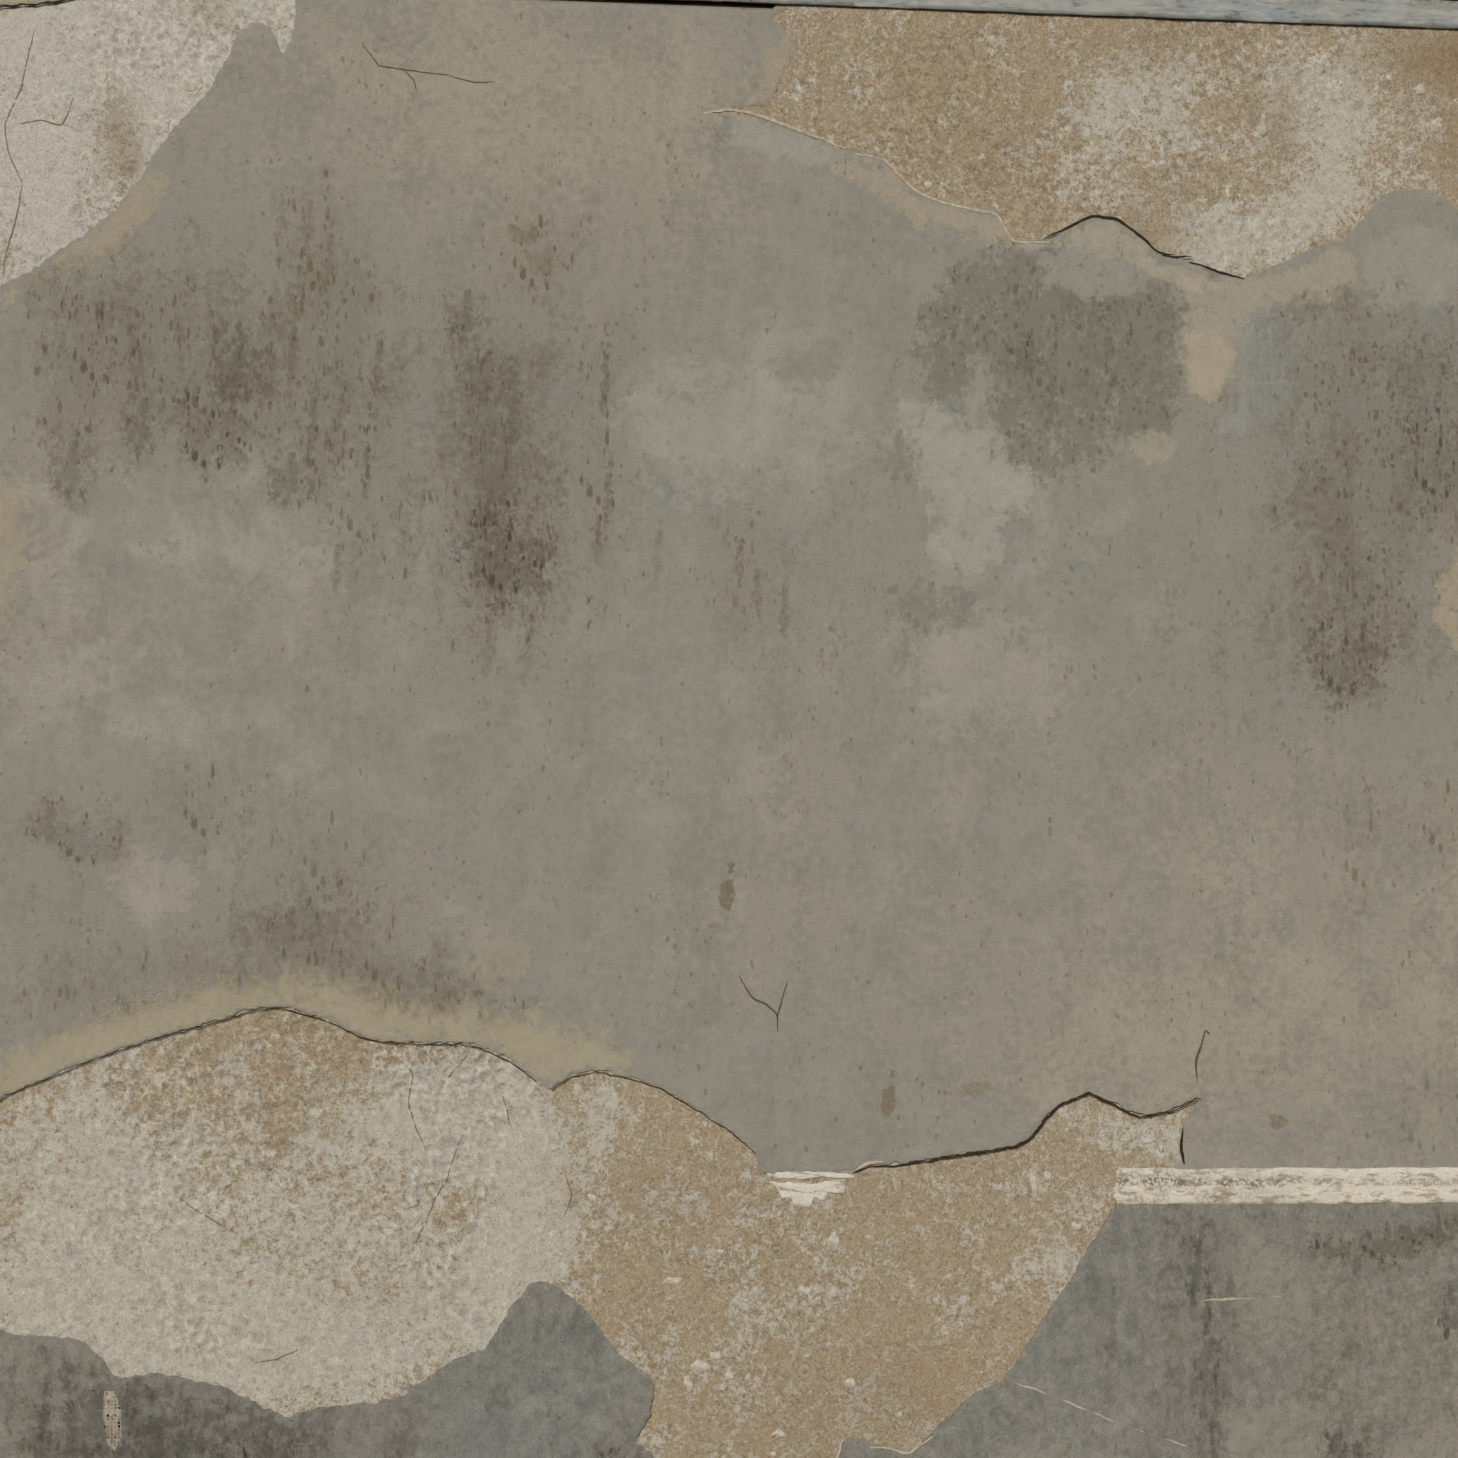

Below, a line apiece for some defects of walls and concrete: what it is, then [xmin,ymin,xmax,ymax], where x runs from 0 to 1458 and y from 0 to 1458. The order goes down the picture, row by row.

crack [361,42,495,91]
flaking render [0,0,296,285]
flaking render [702,5,1458,277]
damp [920,284,1105,426]
damp [173,392,248,479]
damp [1391,406,1455,509]
damp [456,488,556,633]
crack [739,975,788,1031]
crack [1195,1030,1210,1081]
crack [1178,1128,1186,1165]
flaking render [0,1007,1200,1458]
damp [1309,1215,1456,1266]